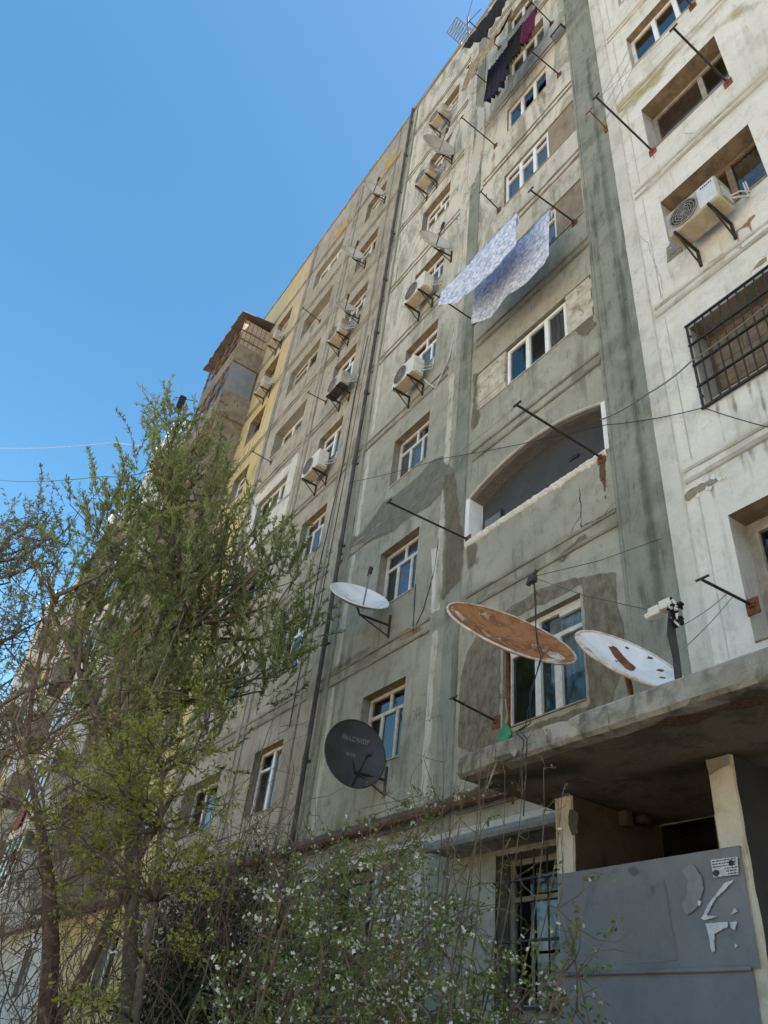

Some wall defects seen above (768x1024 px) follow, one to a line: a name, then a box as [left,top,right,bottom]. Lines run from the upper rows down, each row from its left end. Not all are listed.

spalling [684,474,726,503]
crack [571,489,616,533]